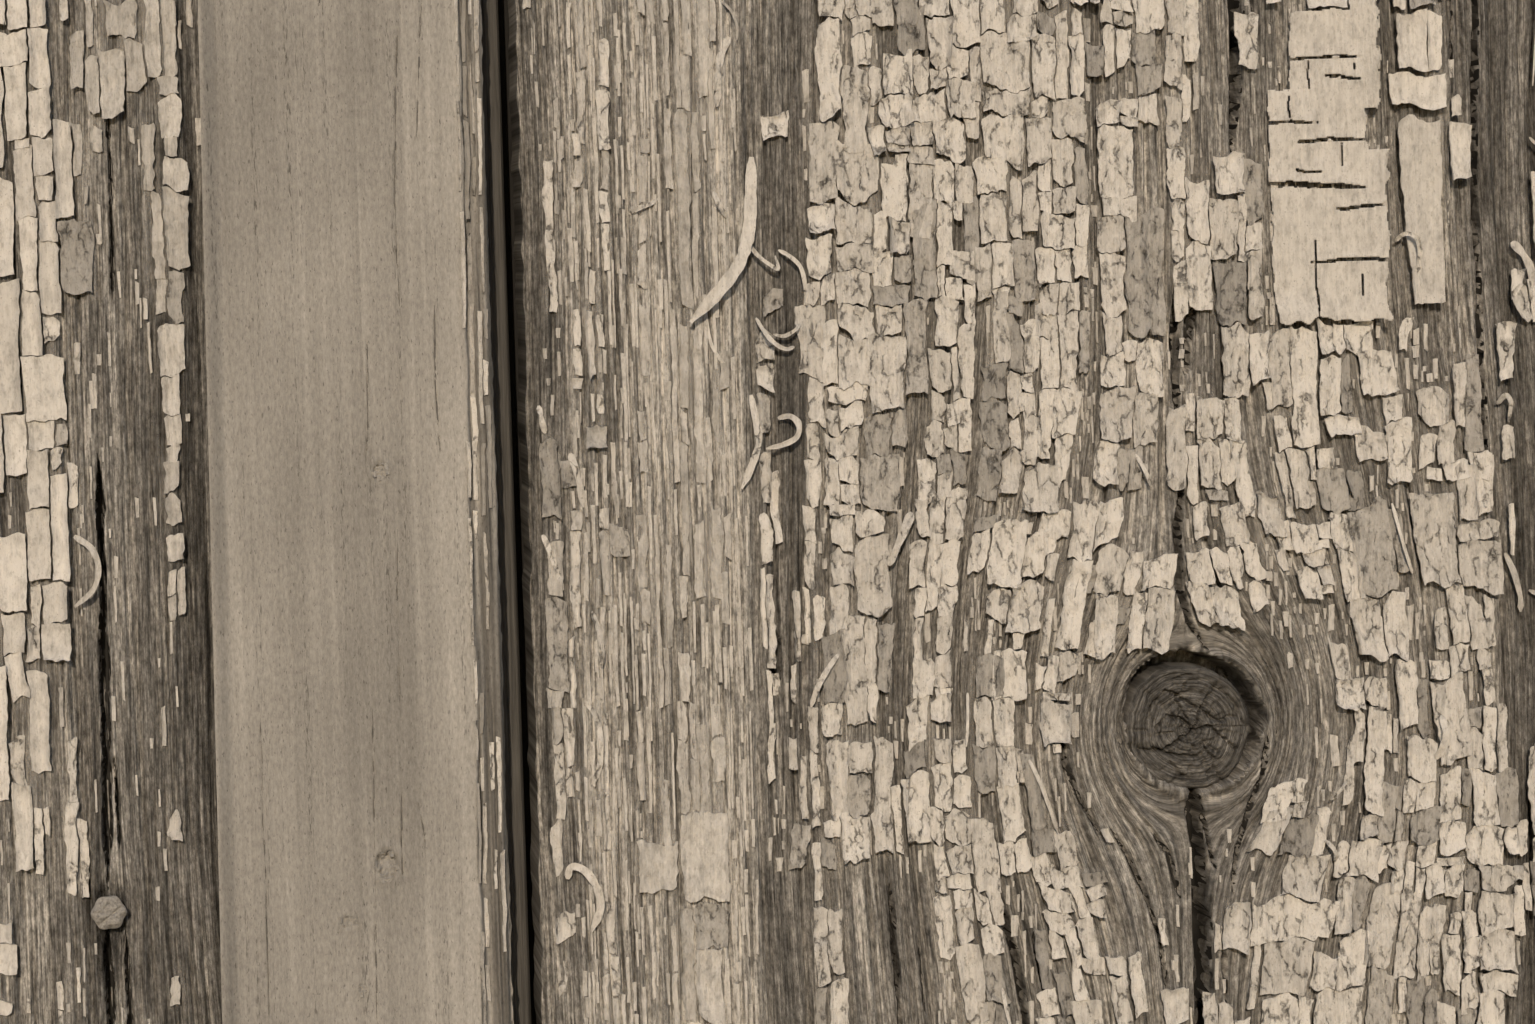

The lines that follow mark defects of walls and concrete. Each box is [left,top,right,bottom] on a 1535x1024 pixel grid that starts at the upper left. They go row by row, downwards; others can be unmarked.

peeling [0,0,201,975]
peeling [522,0,1535,1024]
crack [95,453,121,890]
peeling [0,999,31,1016]
peeling [56,943,97,1024]
crack [103,929,133,1024]
peeling [170,976,181,1006]
crack [1060,736,1269,1024]